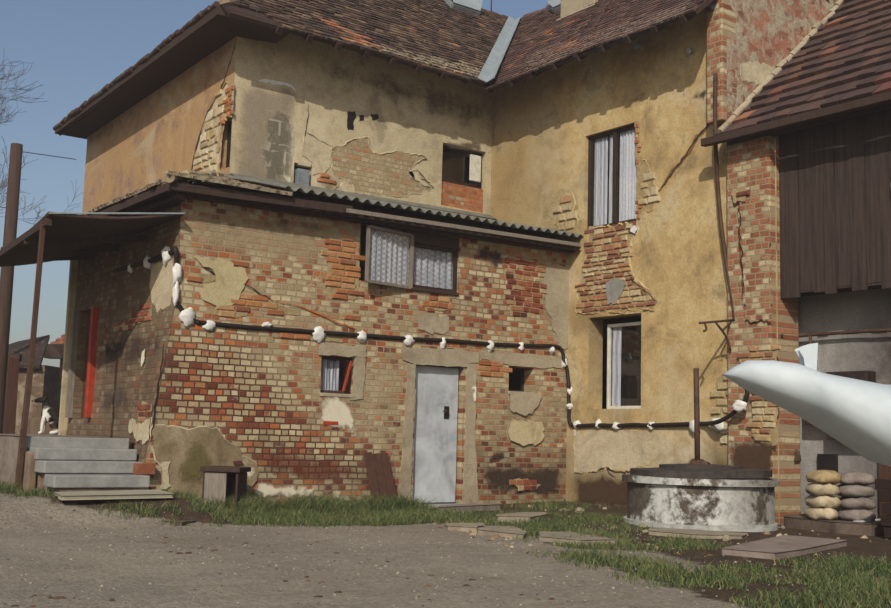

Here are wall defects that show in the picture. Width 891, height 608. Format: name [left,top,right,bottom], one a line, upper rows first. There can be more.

peeling [739,61,774,86]
spalling [191,82,235,172]
spalling [263,111,434,198]
crack [656,124,711,196]
spalling [505,122,660,350]
crack [736,207,744,302]
peeling [112,255,300,332]
spalling [737,343,781,363]
peeling [573,427,666,476]
spalling [710,370,728,444]
spalling [746,393,779,446]
water stain [579,476,627,506]